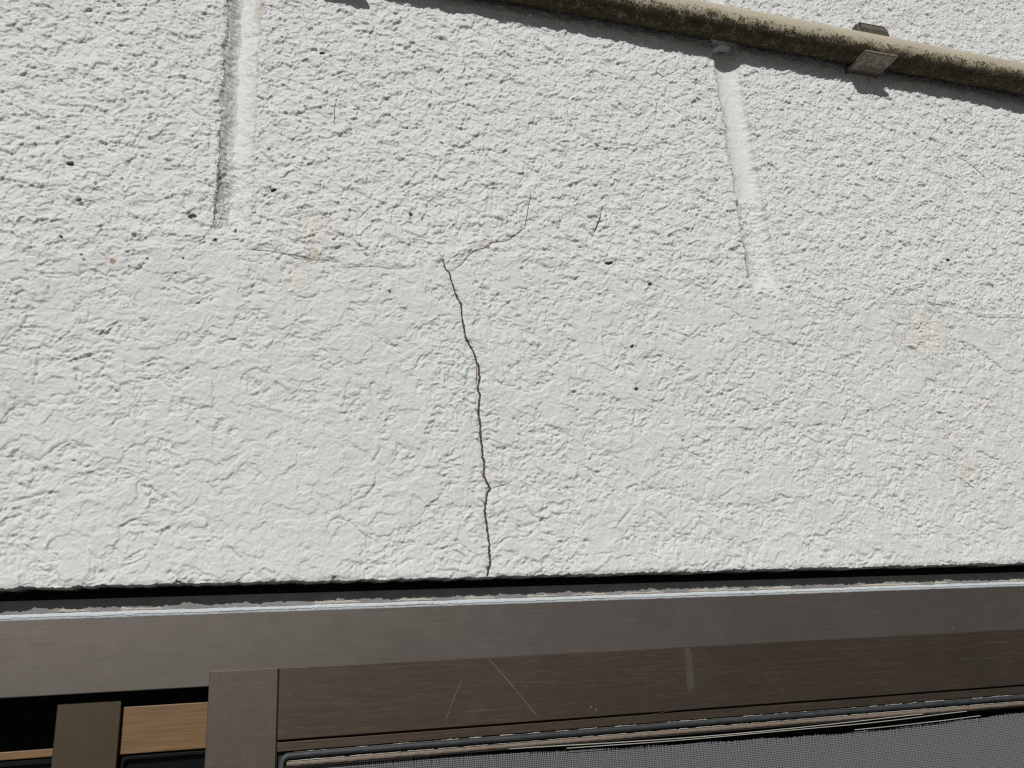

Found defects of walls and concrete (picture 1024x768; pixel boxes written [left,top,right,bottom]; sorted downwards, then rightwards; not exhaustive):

crack [241,247,405,269]
crack [440,192,531,576]